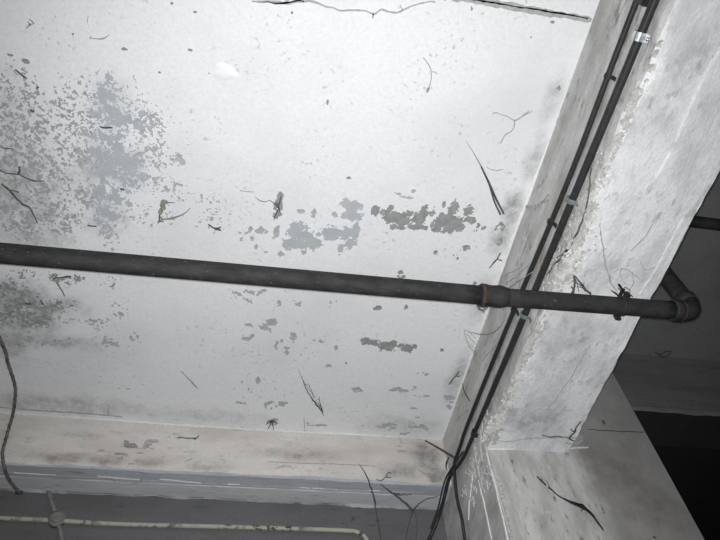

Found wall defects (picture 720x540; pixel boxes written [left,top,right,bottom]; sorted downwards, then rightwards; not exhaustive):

crack [252,0,435,18]
peeling [238,191,507,257]
peeling [241,318,278,341]
peeling [273,332,297,355]
peeling [360,337,417,354]